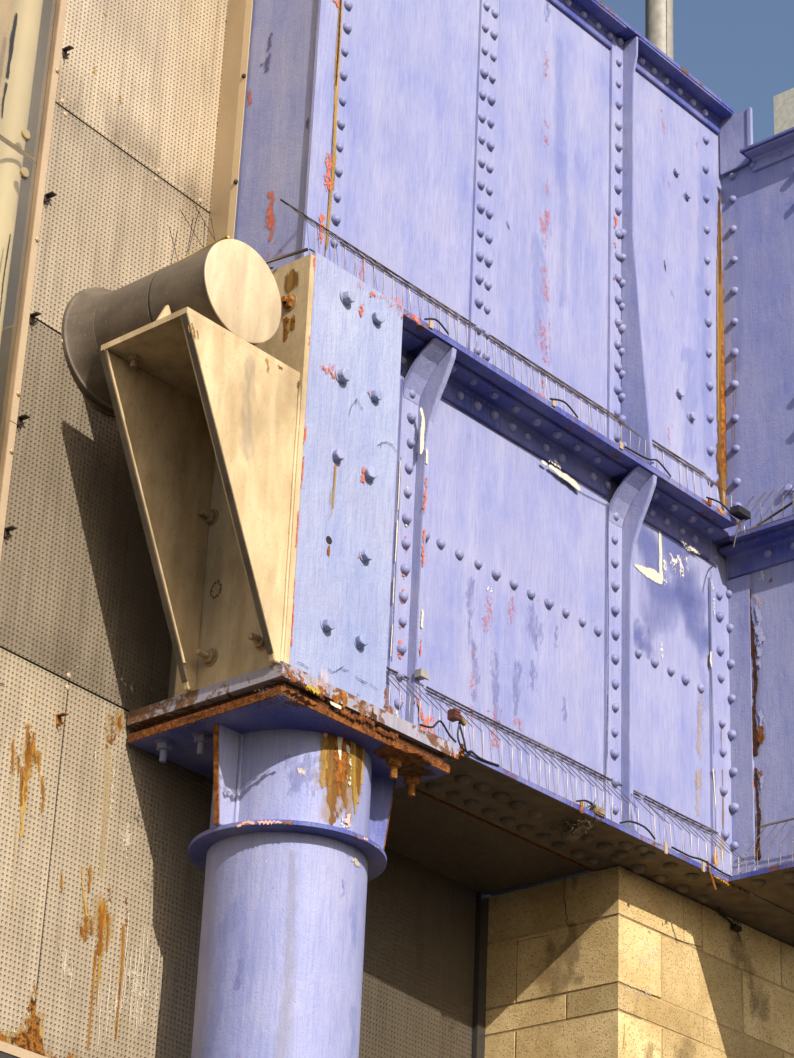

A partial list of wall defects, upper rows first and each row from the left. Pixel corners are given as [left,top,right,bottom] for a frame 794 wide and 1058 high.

rust [249,672,433,826]